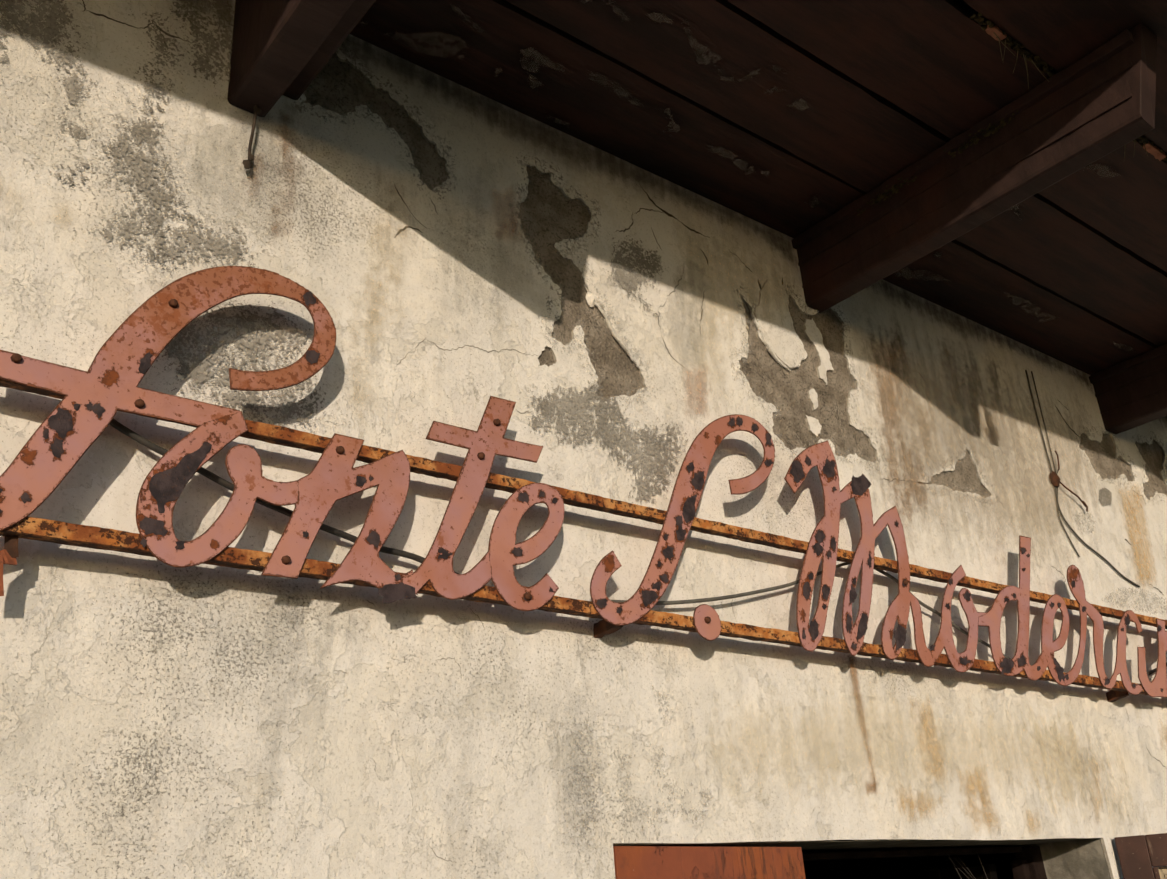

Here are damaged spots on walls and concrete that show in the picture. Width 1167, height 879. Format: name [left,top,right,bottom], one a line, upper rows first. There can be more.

flaking render [304,54,453,190]
flaking render [513,163,688,507]
crack [616,185,783,368]
flaking render [734,279,876,462]
flaking render [916,448,990,498]
flaking render [1079,431,1167,506]